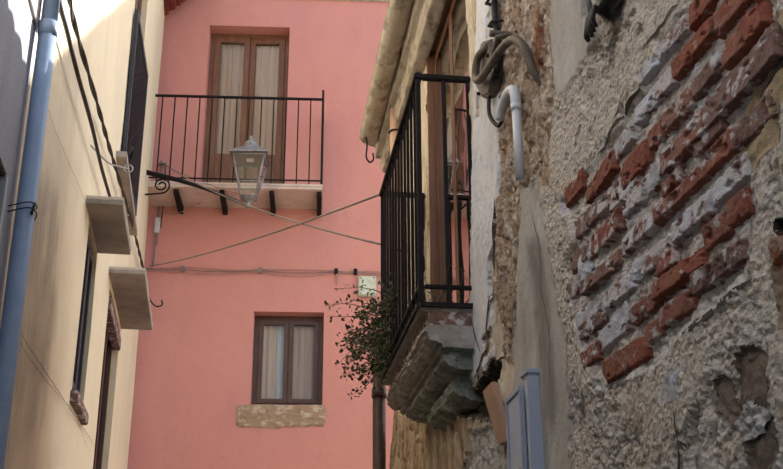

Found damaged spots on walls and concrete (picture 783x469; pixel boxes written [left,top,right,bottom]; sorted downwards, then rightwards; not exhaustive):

crack [19,333,94,448]
spalling [389,0,555,469]
spalling [558,0,783,393]
spalling [712,344,778,469]